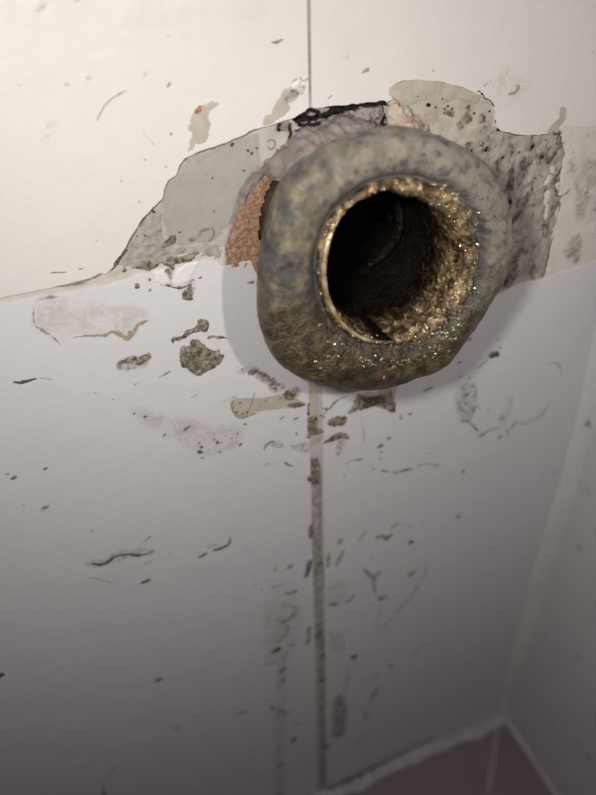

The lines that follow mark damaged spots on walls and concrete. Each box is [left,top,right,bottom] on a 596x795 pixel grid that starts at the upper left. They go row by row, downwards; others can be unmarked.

spalling [111,78,569,293]
peeling [230,368,306,419]